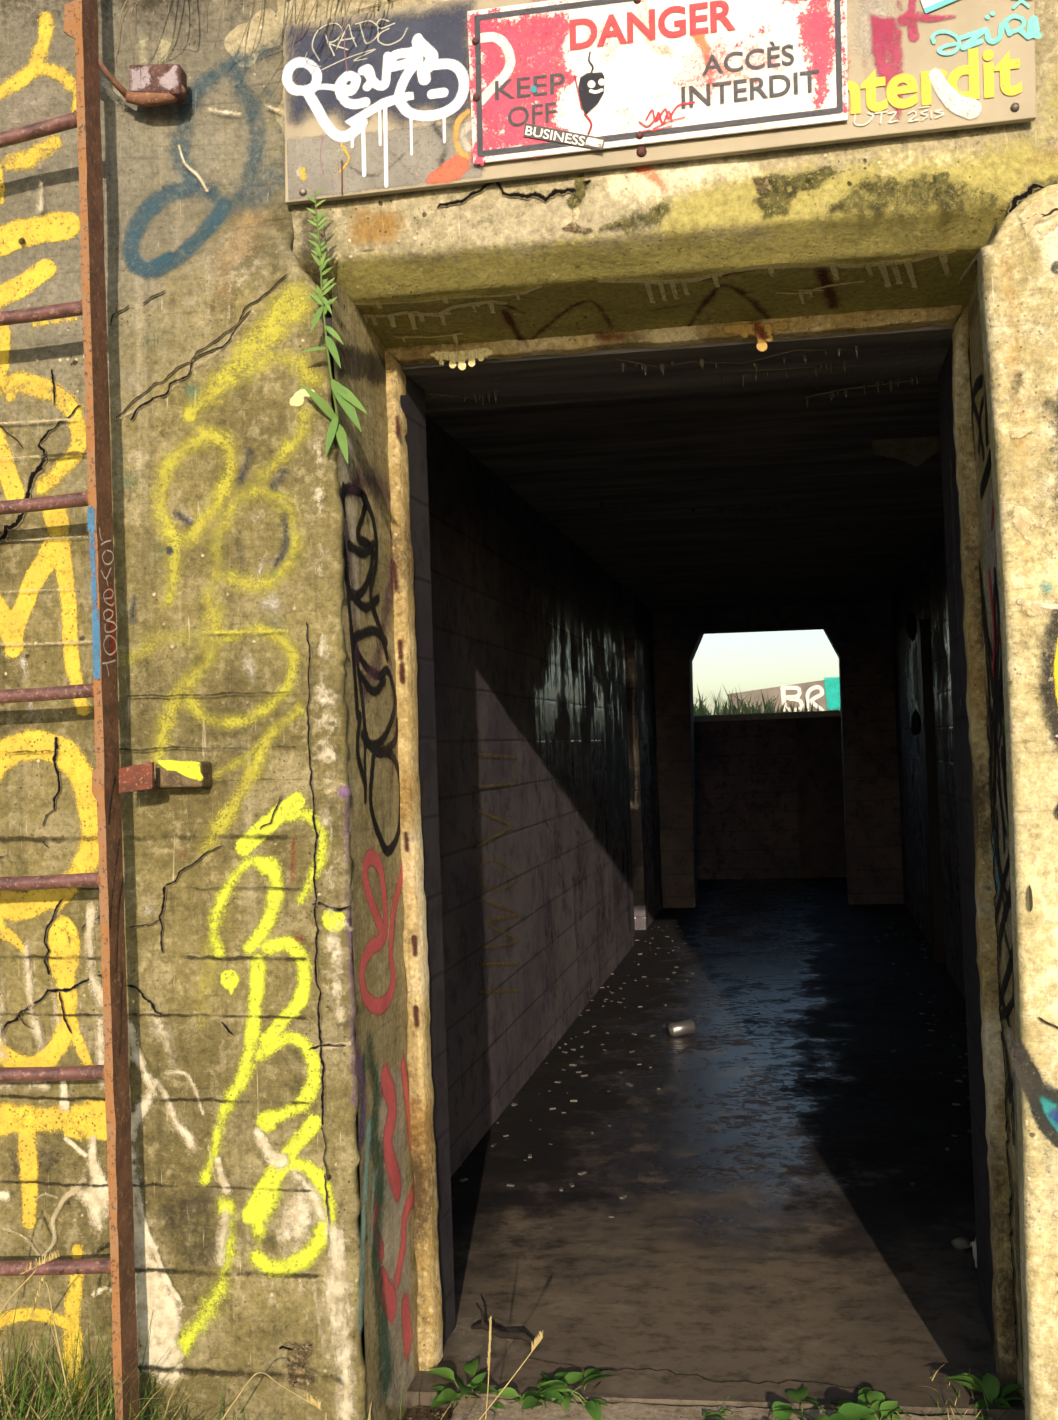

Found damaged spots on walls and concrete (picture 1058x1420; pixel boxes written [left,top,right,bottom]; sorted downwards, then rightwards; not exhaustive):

crack [437,180,591,208]
damp [643,280,690,303]
damp [865,260,918,288]
crack [110,274,287,421]
crack [0,369,81,544]
crack [42,737,61,848]
crack [0,846,221,1035]
crack [260,622,351,1241]
crack [523,1356,876,1391]